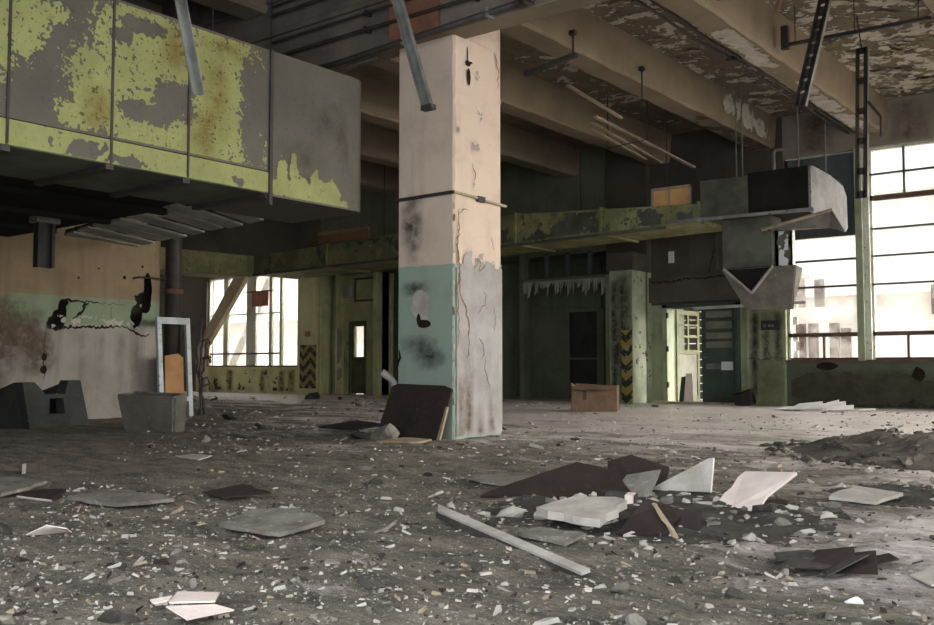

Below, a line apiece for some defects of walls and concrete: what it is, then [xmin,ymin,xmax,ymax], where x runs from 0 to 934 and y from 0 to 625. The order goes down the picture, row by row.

peeling [582,0,872,150]
peeling [765,0,934,99]
peeling [66,139,151,170]
peeling [500,211,610,244]
crack [40,298,150,379]
spalling [46,265,153,331]
crack [456,208,496,388]